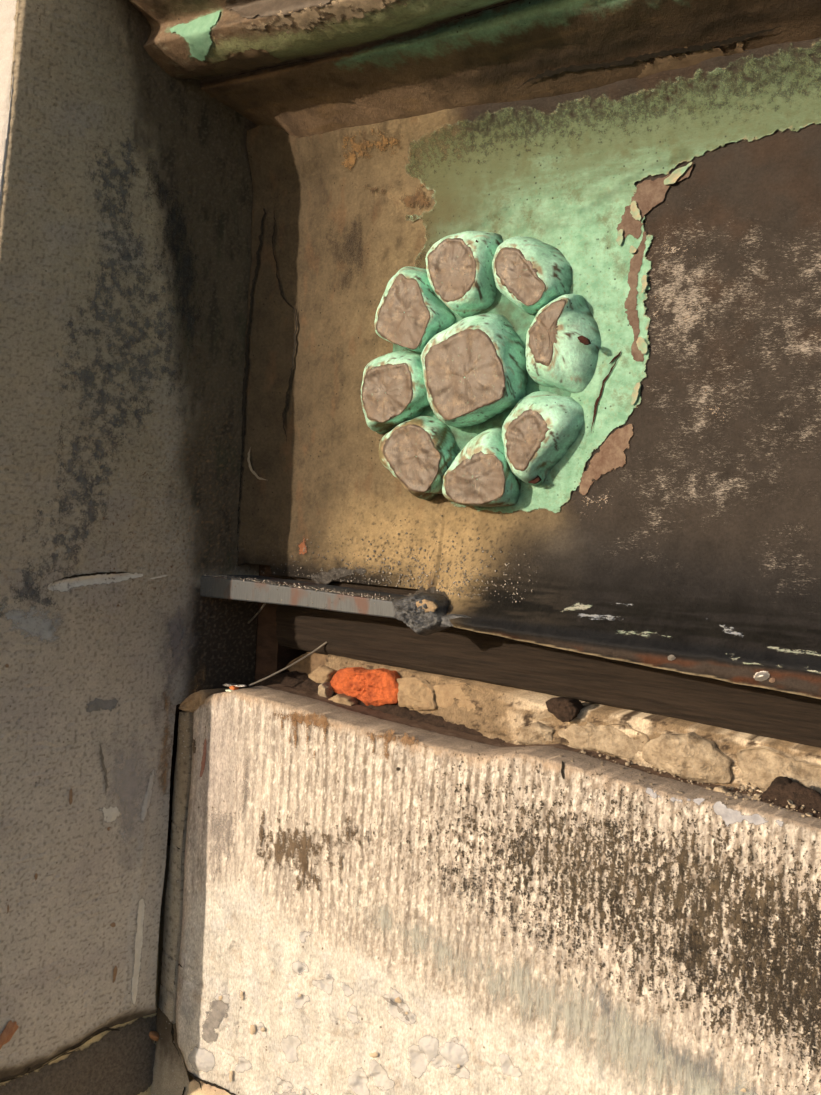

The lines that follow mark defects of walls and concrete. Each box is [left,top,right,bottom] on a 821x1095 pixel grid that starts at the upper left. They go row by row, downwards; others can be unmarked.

peeling [170,10,221,61]
peeling [616,162,693,362]
crack [236,199,298,566]
peeling [630,382,640,405]
leakage [209,811,243,880]
leakage [256,741,821,1095]